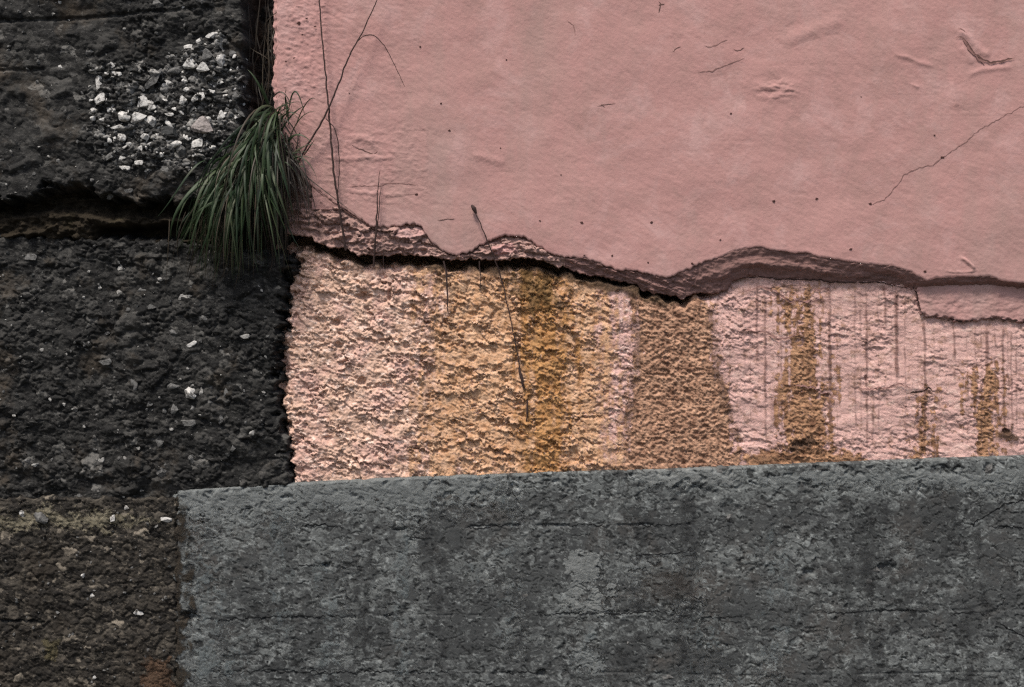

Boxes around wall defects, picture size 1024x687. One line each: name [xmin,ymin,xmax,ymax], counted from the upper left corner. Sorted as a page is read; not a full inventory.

crack [872,106,1024,205]
peeling [284,165,1024,470]
leakage [883,288,898,373]